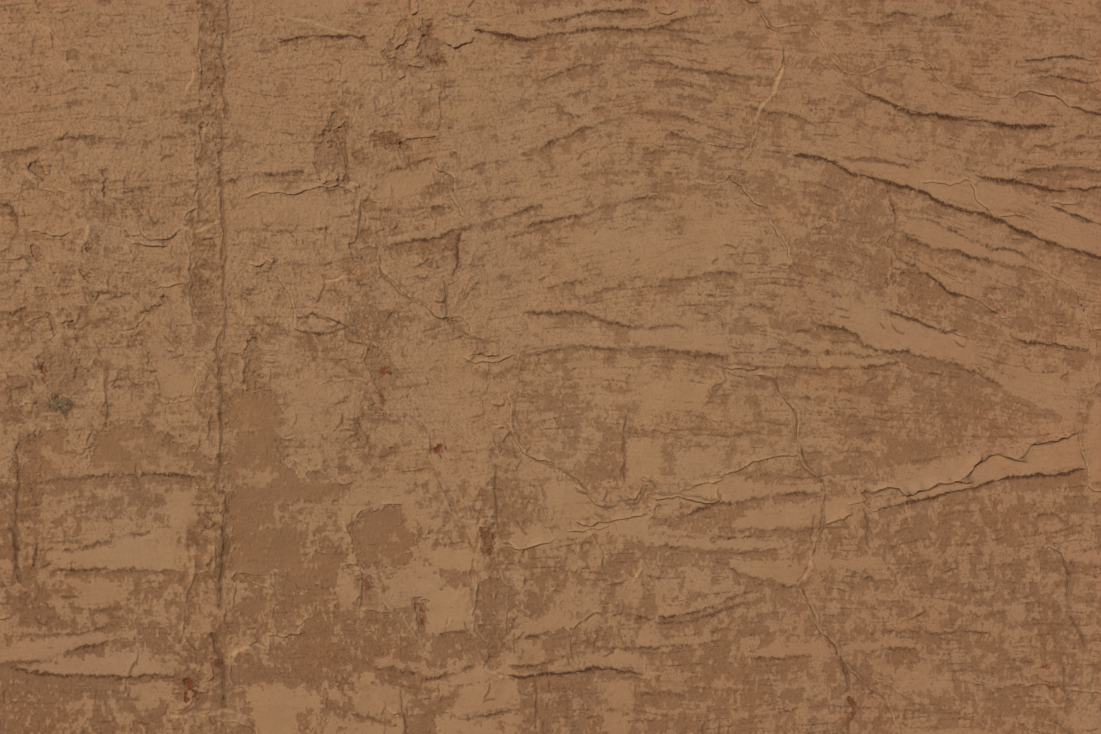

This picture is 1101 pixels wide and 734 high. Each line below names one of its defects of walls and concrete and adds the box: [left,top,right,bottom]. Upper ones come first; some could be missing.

crack [745,0,1101,134]
crack [793,153,1101,306]
crack [122,0,522,708]
spalling [319,343,414,419]
crack [883,310,974,340]
crack [926,273,1091,352]
peeling [10,419,218,491]
peeling [337,501,433,655]
crack [469,361,1084,734]